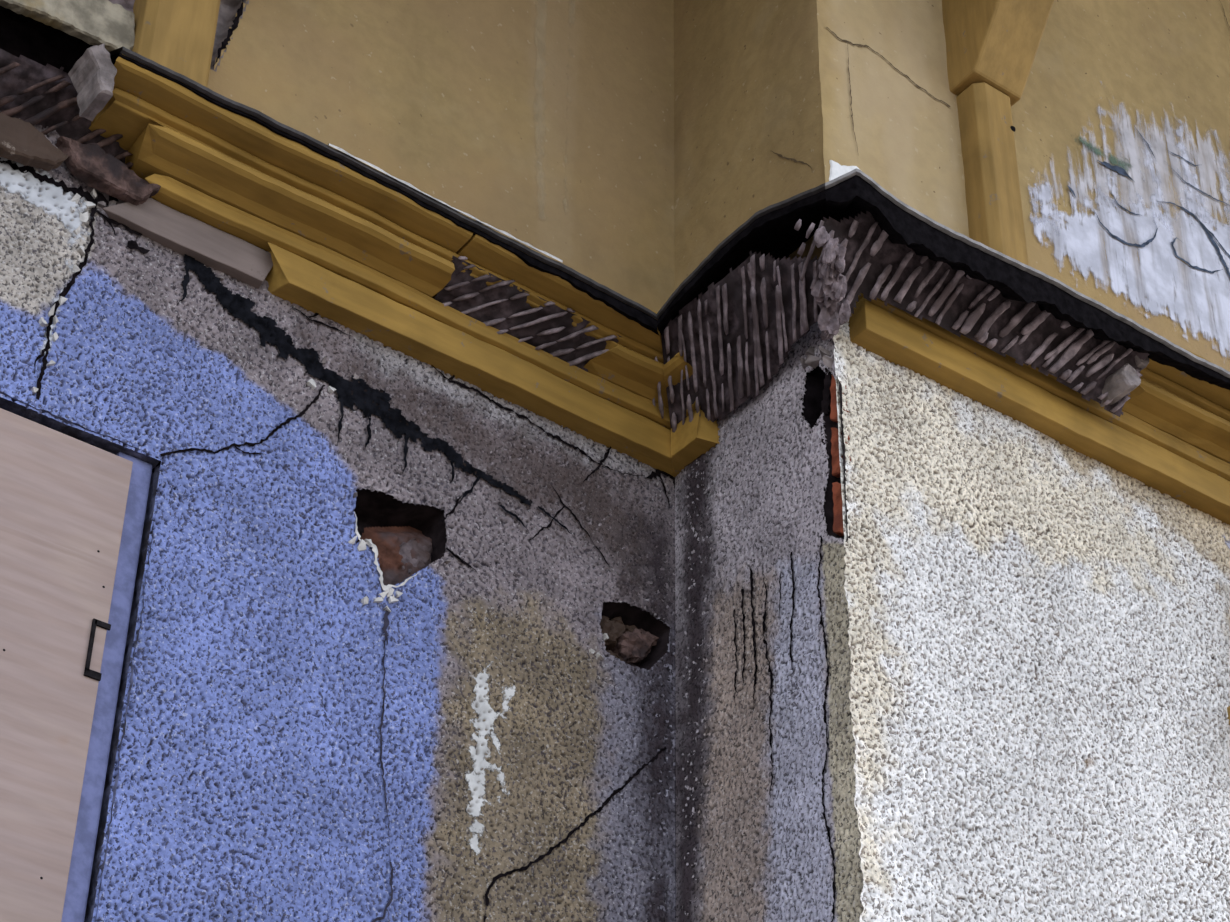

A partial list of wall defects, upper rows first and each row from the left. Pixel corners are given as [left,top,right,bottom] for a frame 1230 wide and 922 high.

spalling [0,0,135,73]
flaking render [210,0,249,72]
crack [826,27,950,152]
peeling [0,157,87,246]
crack [0,158,150,400]
crack [160,254,675,574]
flaking render [798,346,851,542]
crack [371,610,393,922]
spalling [348,485,451,612]
crack [484,747,667,922]
spalling [589,599,676,670]
leakage [642,453,713,922]